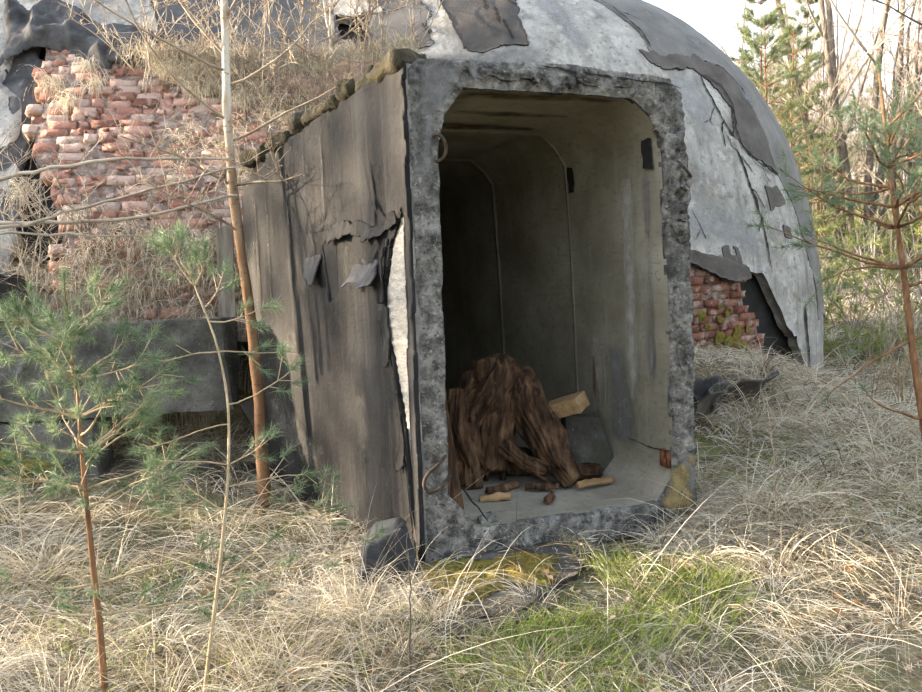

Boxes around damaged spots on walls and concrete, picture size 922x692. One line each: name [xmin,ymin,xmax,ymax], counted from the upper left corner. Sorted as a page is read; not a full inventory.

crack [542,65,679,88]
crack [700,75,778,268]
peeling [303,211,410,473]